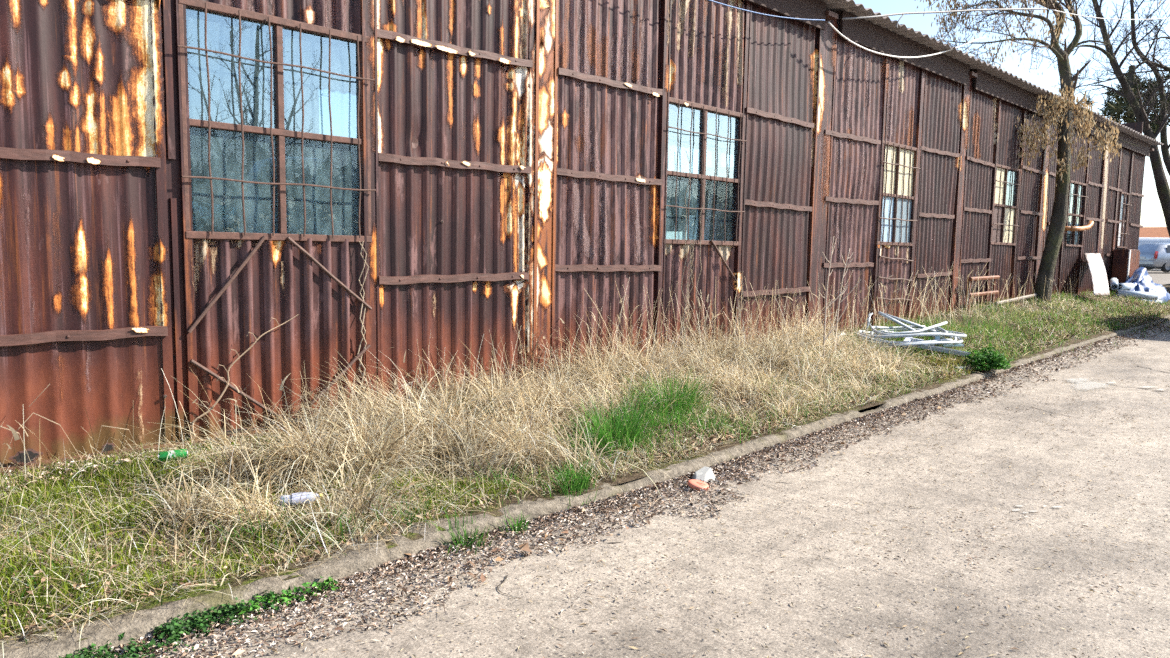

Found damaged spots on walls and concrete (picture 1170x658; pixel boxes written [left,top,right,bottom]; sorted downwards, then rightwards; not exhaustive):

peeling [8,0,21,33]
rust [45,112,83,152]
peeling [57,0,164,173]
peeling [366,0,481,153]
rust [446,38,456,128]
rust [473,115,481,158]
rust [496,112,506,165]
peeling [473,0,559,362]
rust [809,46,826,136]
peeling [70,217,92,322]
rust [101,217,140,329]
peeling [131,239,169,333]